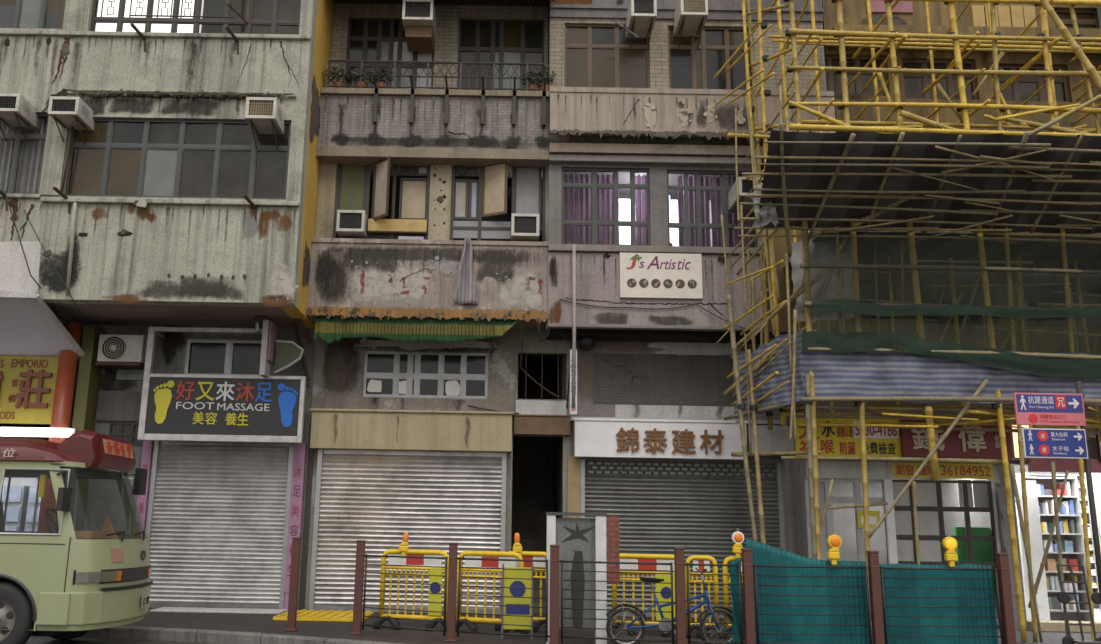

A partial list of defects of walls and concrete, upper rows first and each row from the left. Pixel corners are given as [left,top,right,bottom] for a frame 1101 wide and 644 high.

corrosion [128,204,155,221]
corrosion [251,206,279,236]
damp [39,236,79,293]
damp [142,277,241,299]